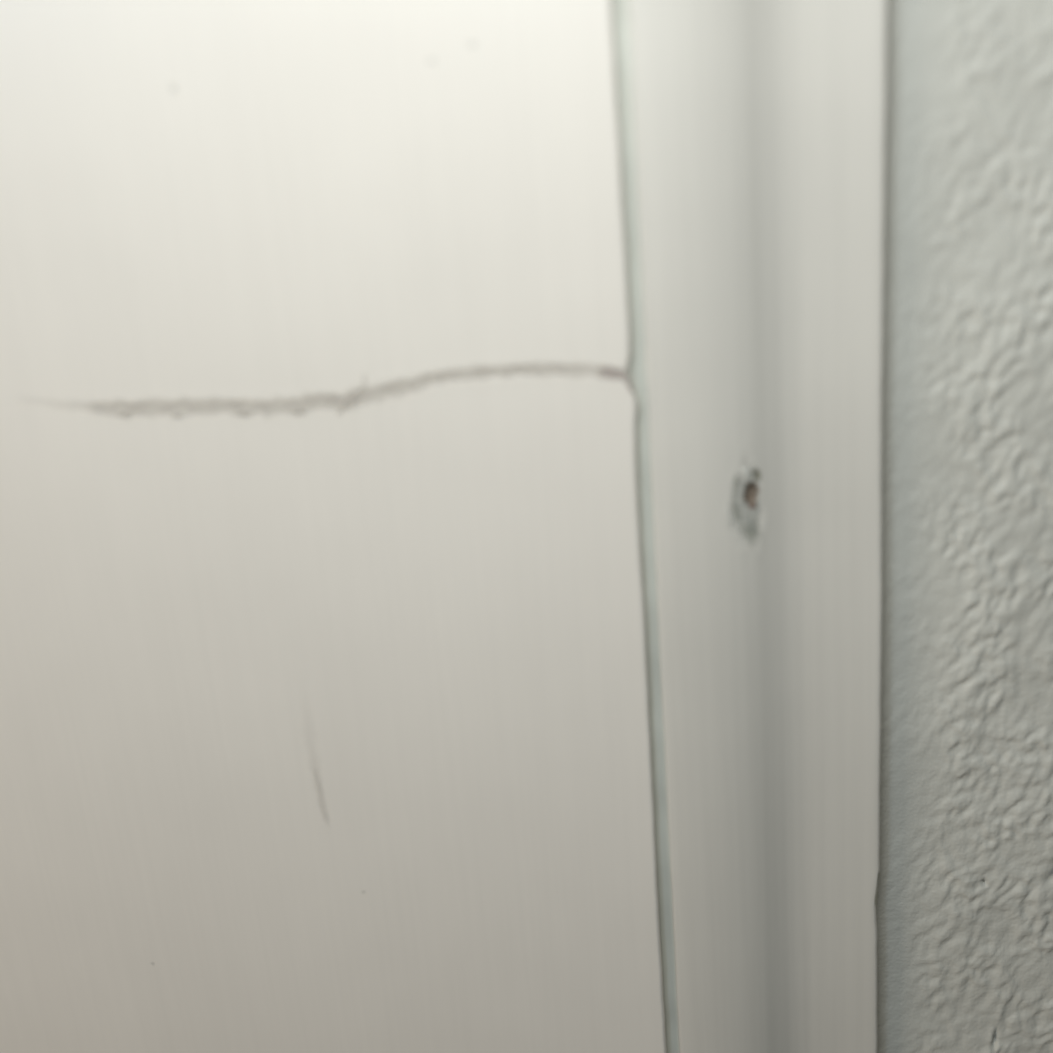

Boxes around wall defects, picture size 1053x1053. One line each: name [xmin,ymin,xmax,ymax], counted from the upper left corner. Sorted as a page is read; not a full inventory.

crack [604,369,622,377]